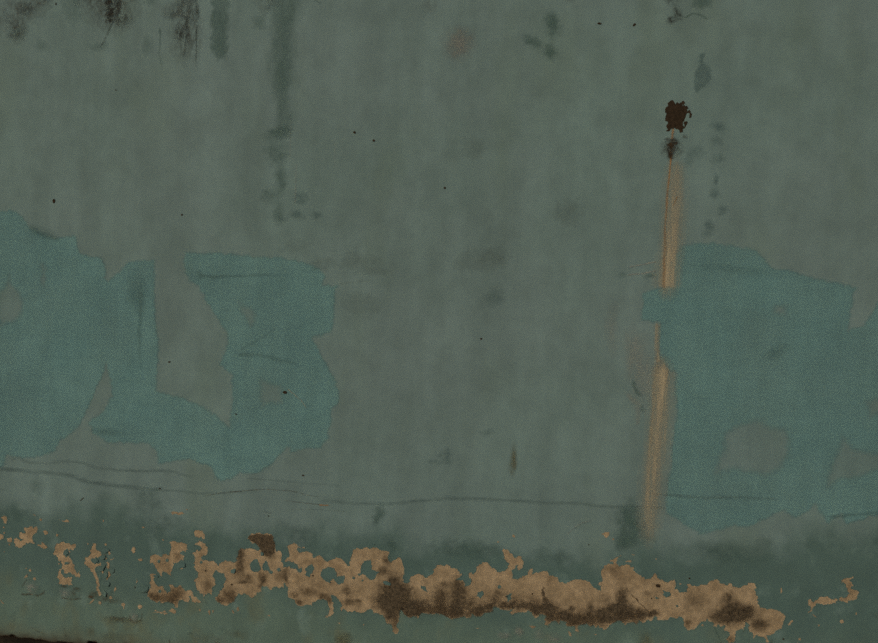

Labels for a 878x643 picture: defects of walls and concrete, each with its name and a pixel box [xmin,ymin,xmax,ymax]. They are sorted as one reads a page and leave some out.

corrosion [661,159,679,288]
peeling [0,514,116,604]
peeling [131,529,793,643]
peeling [807,575,860,626]